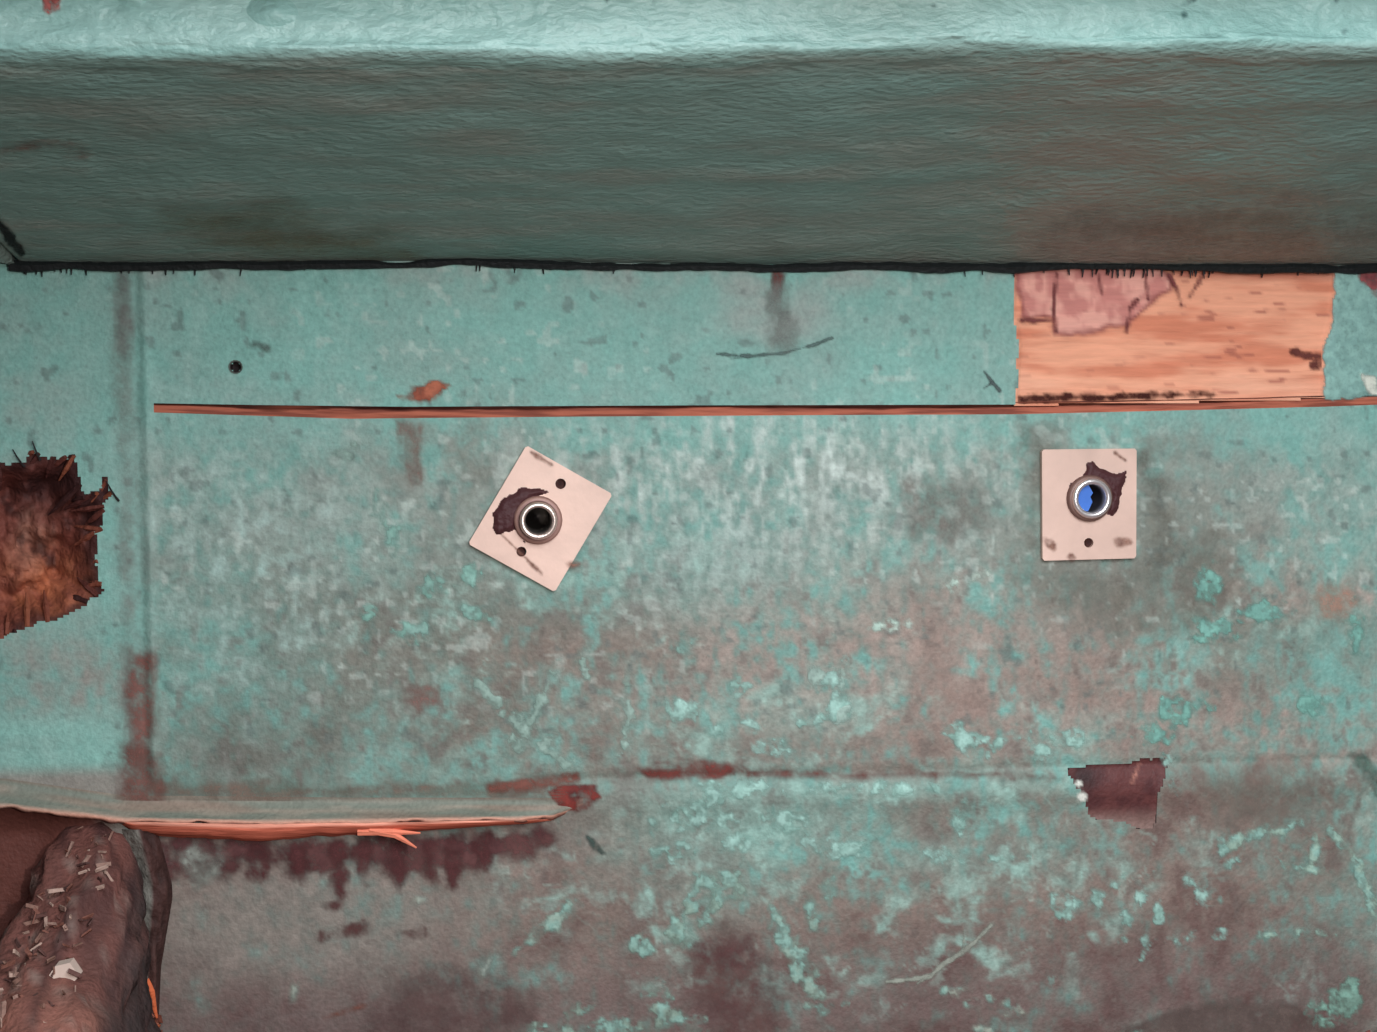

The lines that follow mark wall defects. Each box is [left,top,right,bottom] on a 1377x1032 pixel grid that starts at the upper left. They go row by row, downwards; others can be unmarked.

peeling [1014,269,1377,406]
peeling [1194,568,1223,601]
peeling [1193,599,1282,643]
spalling [1068,696,1216,829]
peeling [1184,876,1221,901]
damp [694,936,774,1032]